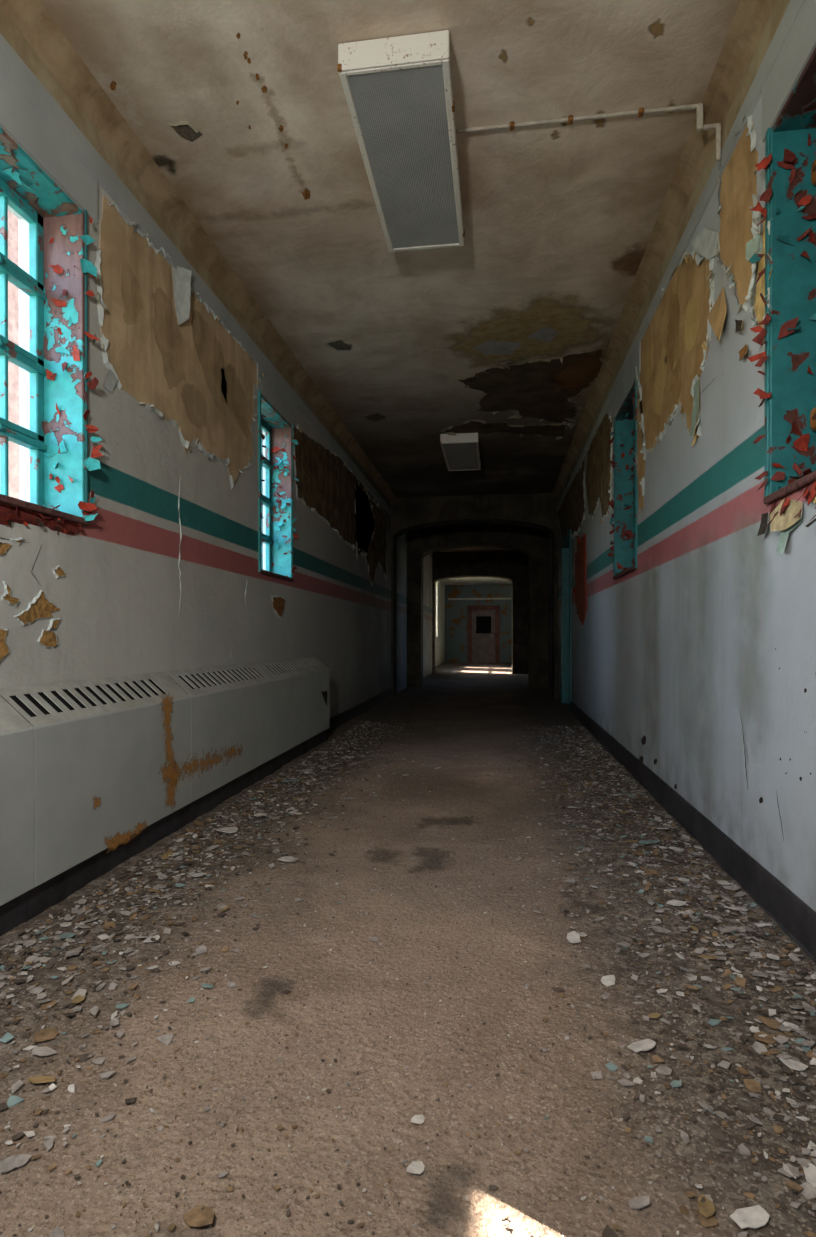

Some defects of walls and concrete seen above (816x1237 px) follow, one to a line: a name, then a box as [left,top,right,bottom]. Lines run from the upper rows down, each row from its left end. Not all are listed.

peeling [2,150,39,203]
peeling [46,195,387,585]
peeling [441,340,610,440]
peeling [558,114,816,626]
peeling [0,439,84,556]
peeling [0,580,61,660]
corrosion [162,694,243,809]